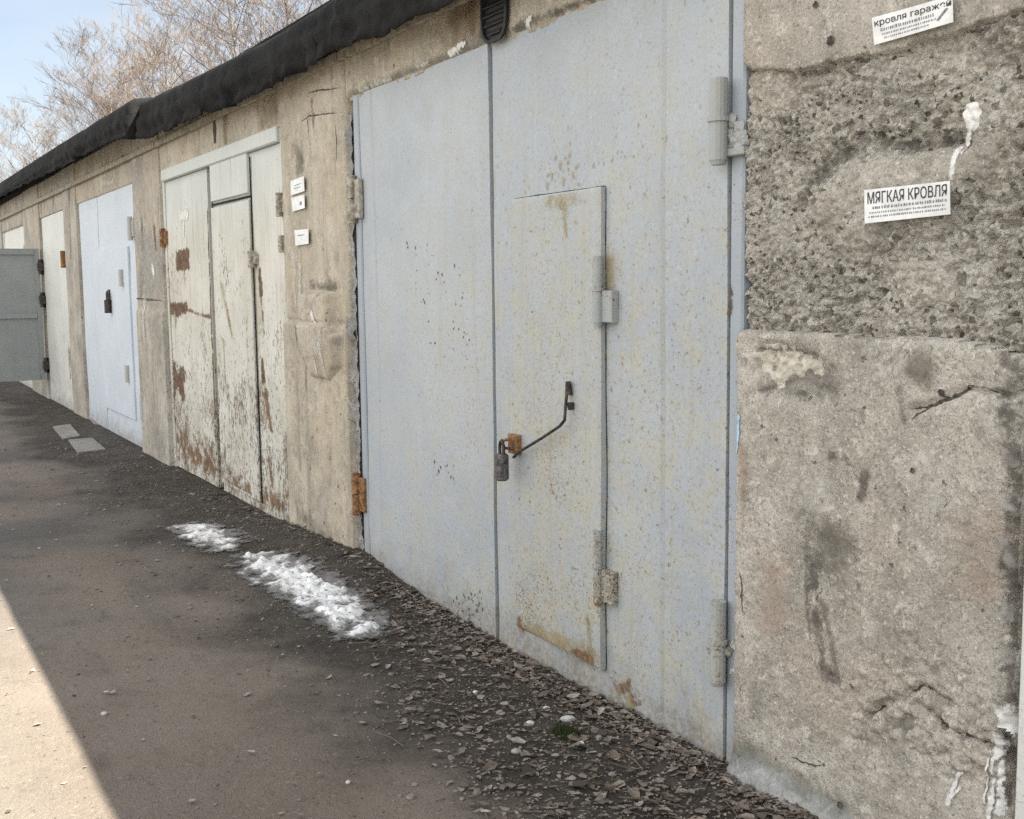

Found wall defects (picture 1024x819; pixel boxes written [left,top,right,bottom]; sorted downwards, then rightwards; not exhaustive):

crack [302,86,341,151]
leakage [802,118,975,205]
peeling [175,247,190,284]
corrosion [170,240,232,440]
spalling [728,10,1024,678]
crack [912,385,1005,419]
corrosion [517,616,595,665]
leakage [804,520,849,685]
corrosion [610,678,641,708]
crack [873,681,1015,773]
leakage [983,704,1019,816]
spalling [995,732,1017,807]